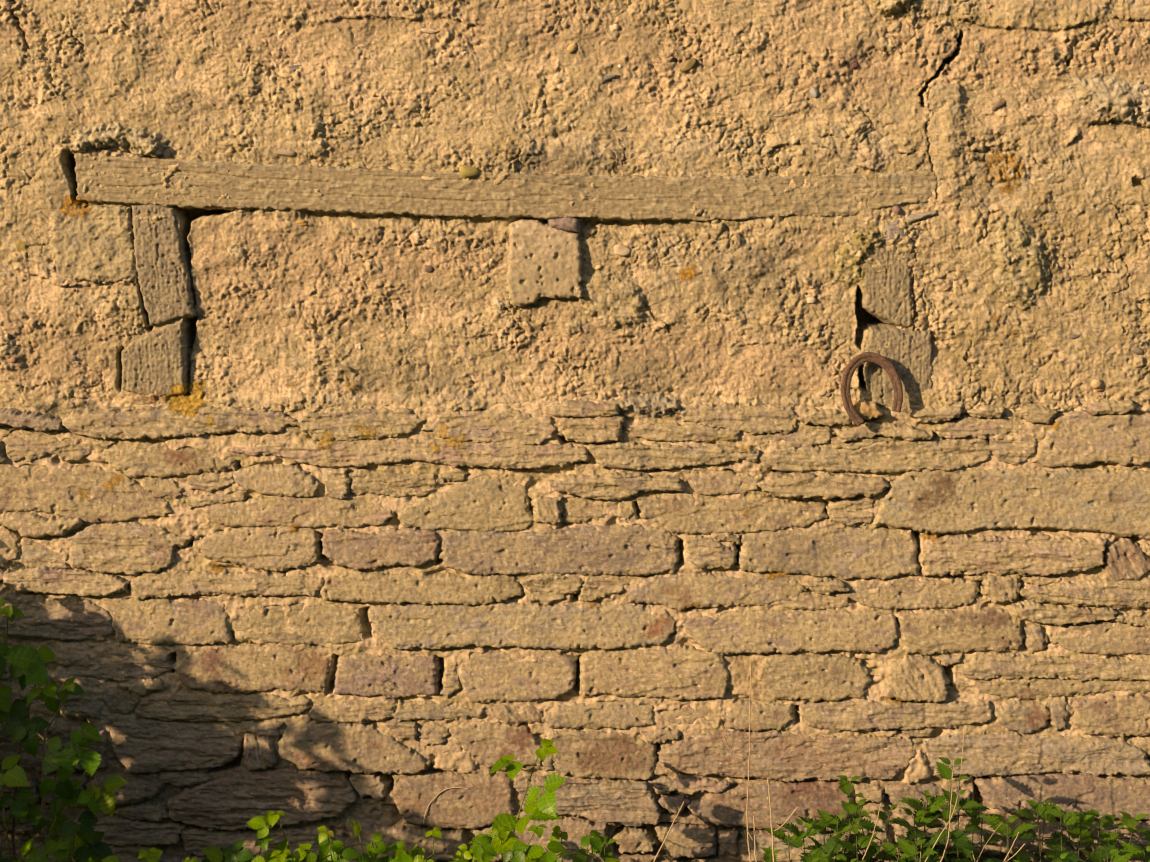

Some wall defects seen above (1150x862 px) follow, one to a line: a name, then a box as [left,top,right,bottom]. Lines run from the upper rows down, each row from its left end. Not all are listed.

crack [10,0,84,99]
crack [900,33,962,199]